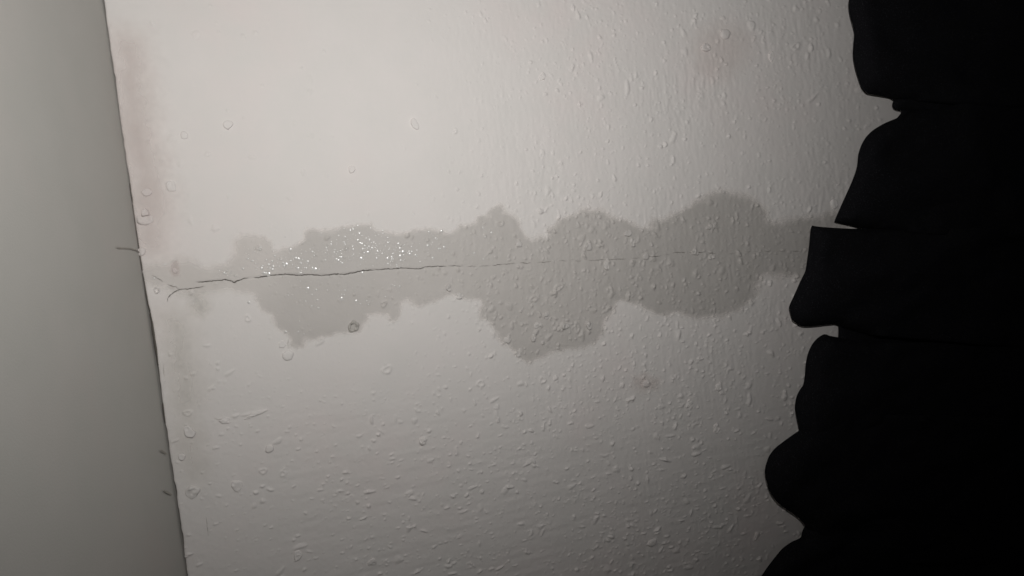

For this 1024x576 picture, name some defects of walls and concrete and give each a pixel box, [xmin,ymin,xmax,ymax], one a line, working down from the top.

crack [116,183,563,365]
damp [218,192,845,361]